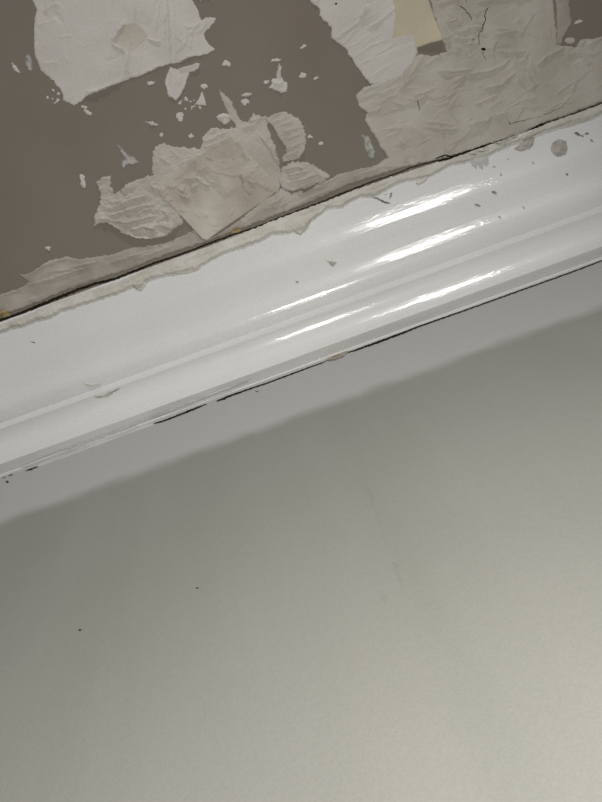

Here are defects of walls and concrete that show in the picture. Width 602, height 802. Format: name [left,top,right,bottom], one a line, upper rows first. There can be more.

peeling [170,265,202,274]
crack [0,103,601,322]
peeling [293,221,311,235]
crack [348,260,602,353]